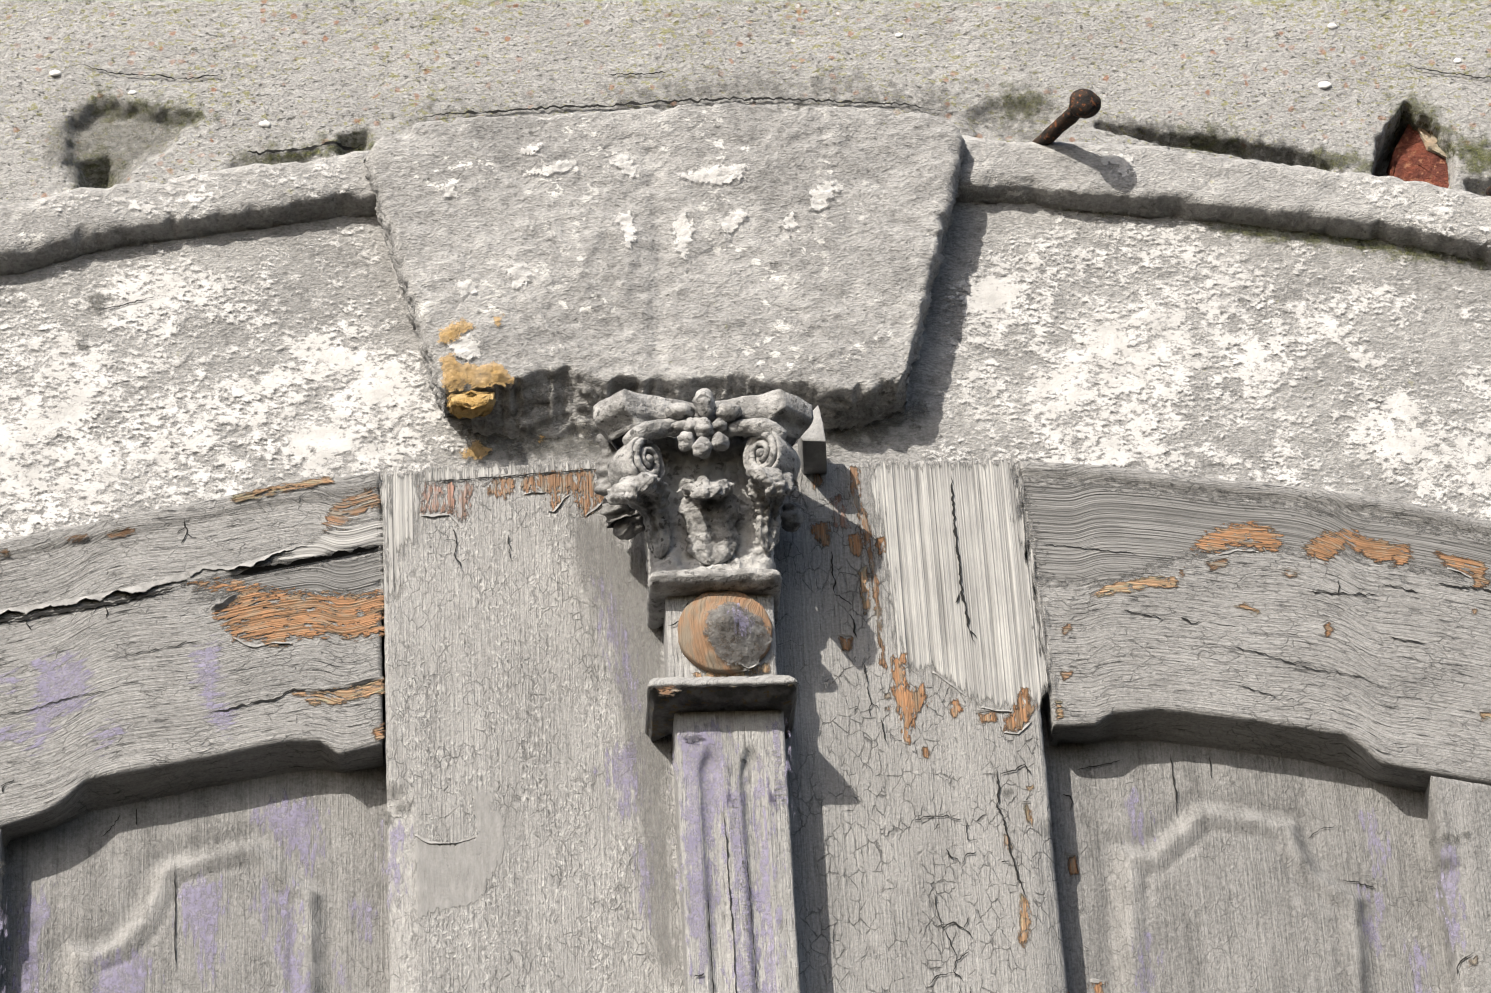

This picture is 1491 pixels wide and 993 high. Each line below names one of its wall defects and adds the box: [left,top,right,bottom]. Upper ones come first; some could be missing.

peeling [443,181,459,197]
flaking render [1096,117,1491,246]
peeling [0,227,604,650]
peeling [809,213,1491,758]
crack [951,478,976,644]
peeling [291,677,385,706]
crack [831,552,888,745]
crack [915,764,1032,895]
crack [1063,760,1119,810]
crack [930,893,972,993]